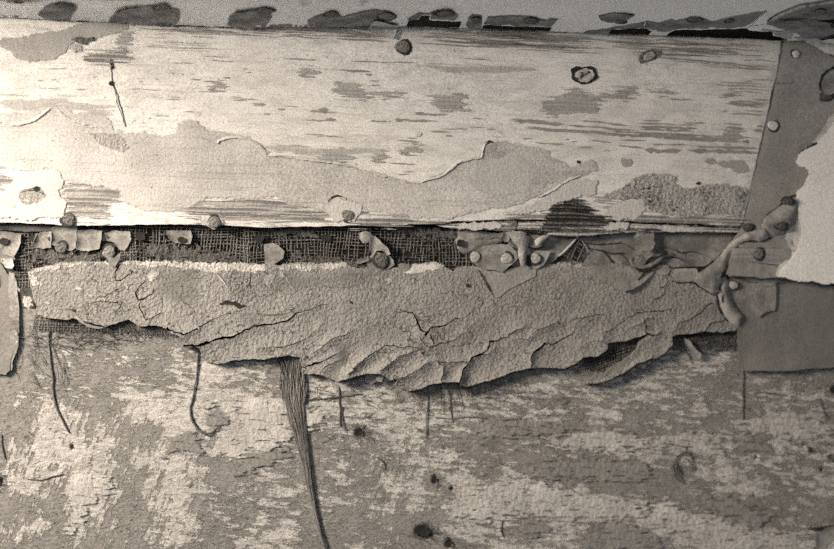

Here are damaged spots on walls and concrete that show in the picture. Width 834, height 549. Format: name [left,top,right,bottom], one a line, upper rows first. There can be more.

peeling [0,21,135,66]
peeling [205,79,229,92]
peeling [331,81,407,101]
peeling [427,93,471,113]
peeling [538,84,678,118]
peeling [0,103,749,231]
crack [28,219,740,391]
peeling [684,339,701,359]
peeling [161,398,329,477]
peeling [734,413,833,442]
peeling [60,469,114,535]
peeling [450,414,816,549]